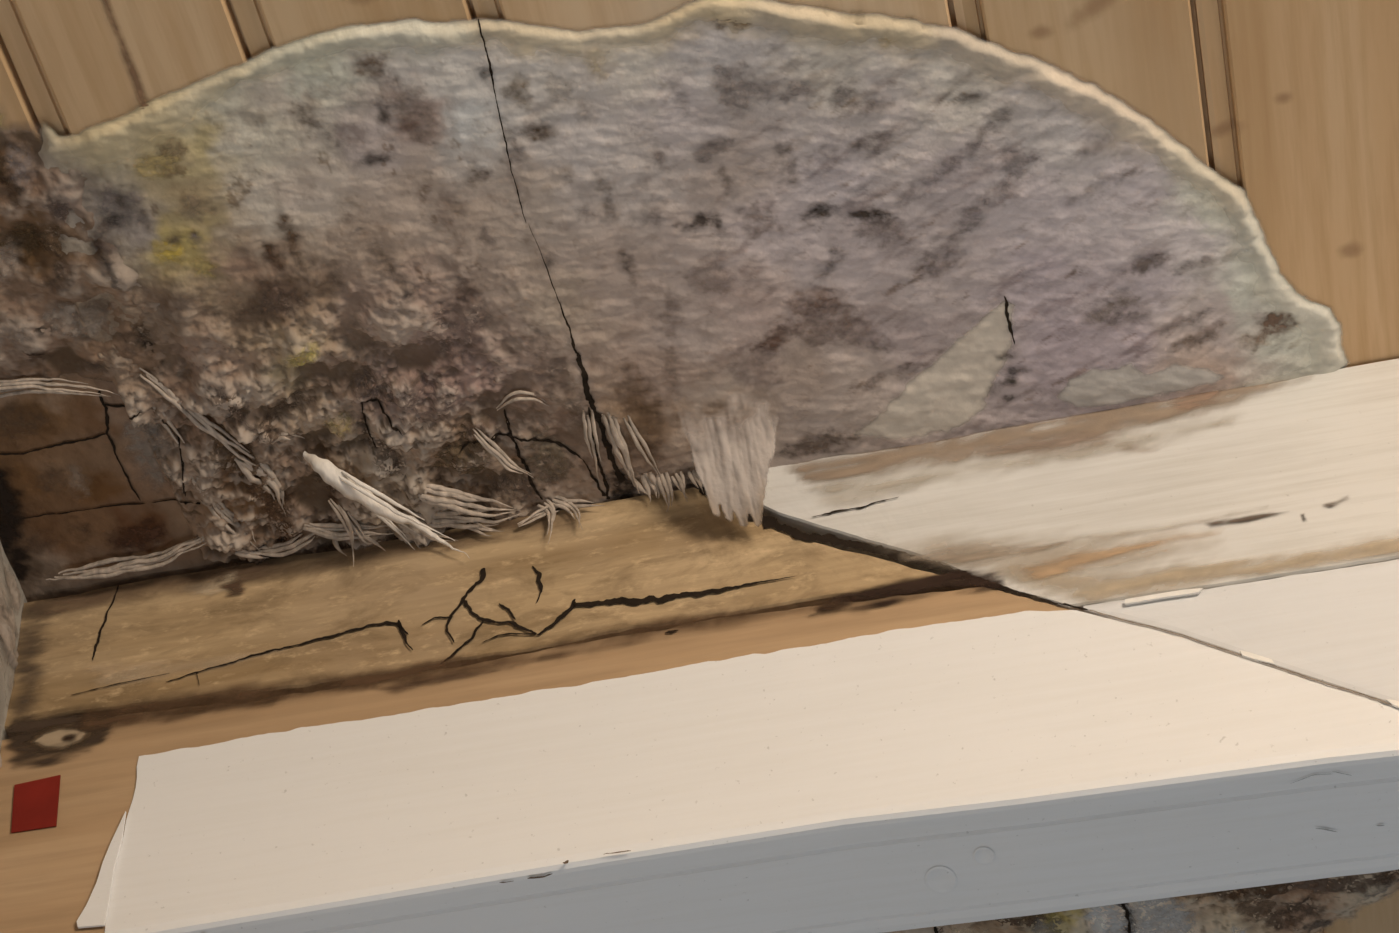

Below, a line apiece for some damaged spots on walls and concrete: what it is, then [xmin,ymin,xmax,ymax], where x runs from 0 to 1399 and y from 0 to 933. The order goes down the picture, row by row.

crack [460,19,626,500]
damp [0,0,1347,765]
crack [72,566,794,695]
crack [1121,903,1131,933]
damp [883,869,1399,933]